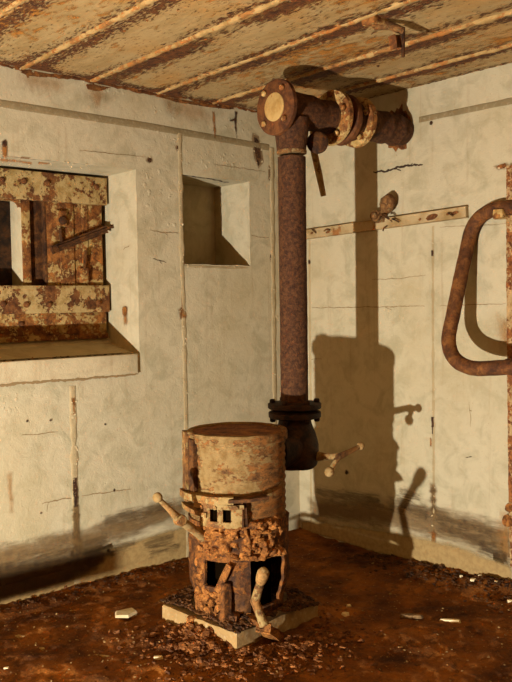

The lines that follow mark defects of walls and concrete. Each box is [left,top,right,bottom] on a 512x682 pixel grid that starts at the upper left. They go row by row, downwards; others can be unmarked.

rust [0,0,512,131]
rust [1,140,49,164]
crack [373,163,423,173]
damp [0,504,186,605]
damp [302,499,512,580]